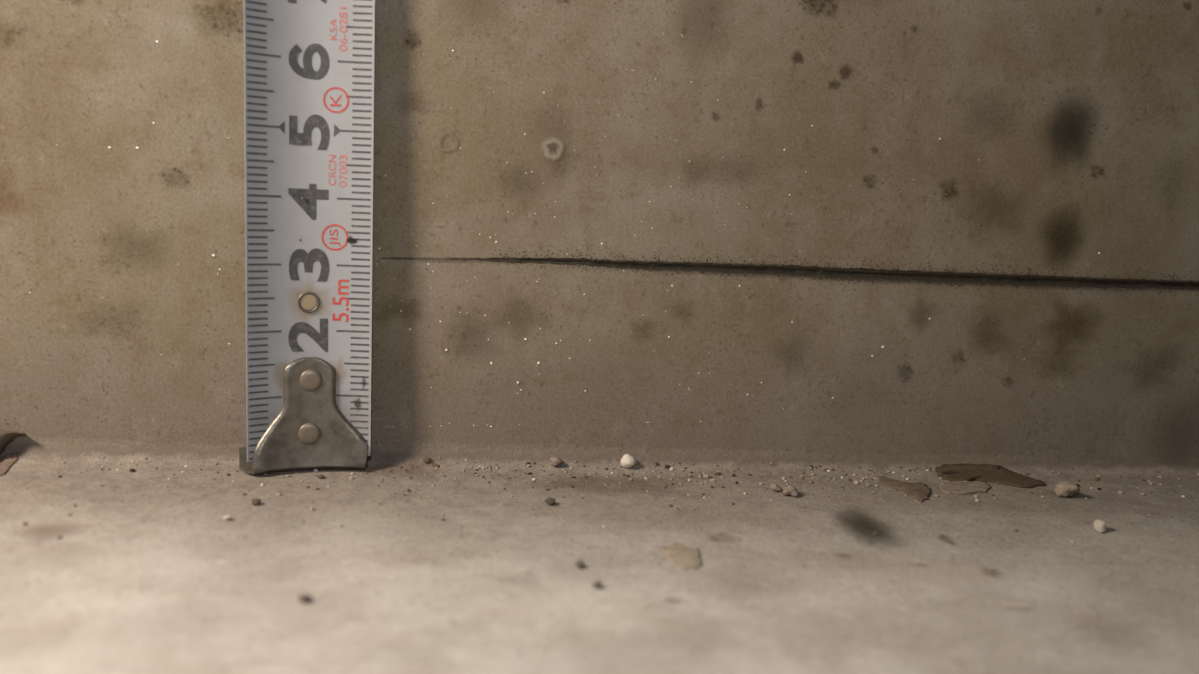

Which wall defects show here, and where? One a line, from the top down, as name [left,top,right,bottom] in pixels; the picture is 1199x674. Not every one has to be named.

leakage [1053,108,1087,151]
crack [382,245,1199,296]